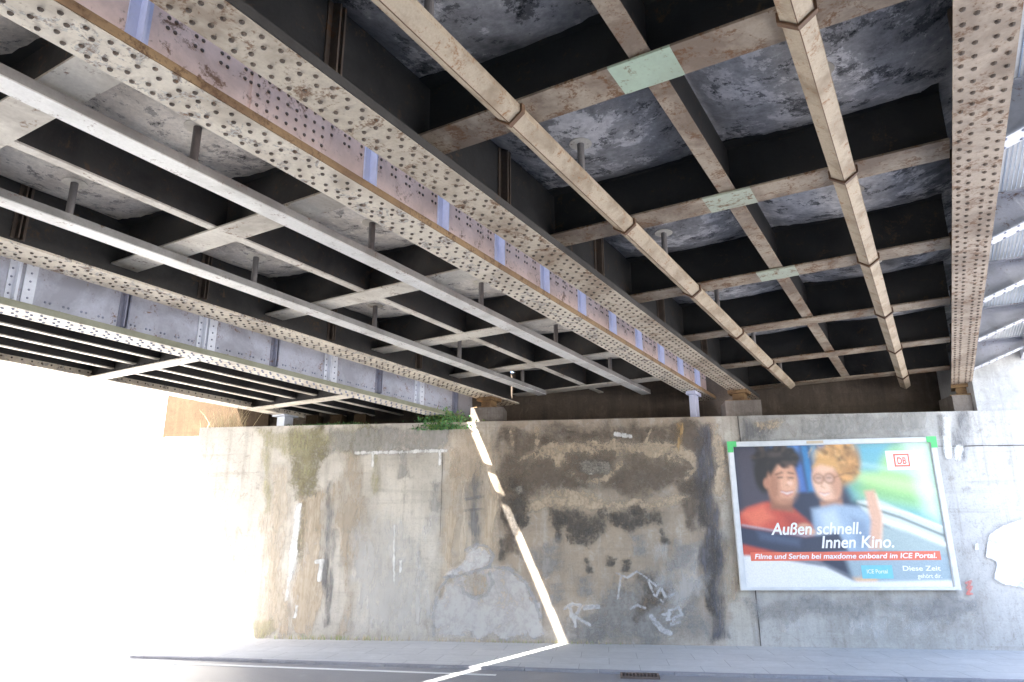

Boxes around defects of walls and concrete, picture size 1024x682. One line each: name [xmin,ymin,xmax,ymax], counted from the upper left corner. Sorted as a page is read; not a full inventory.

damp [285,427,449,635]
damp [503,423,737,640]
peeling [975,519,1024,588]